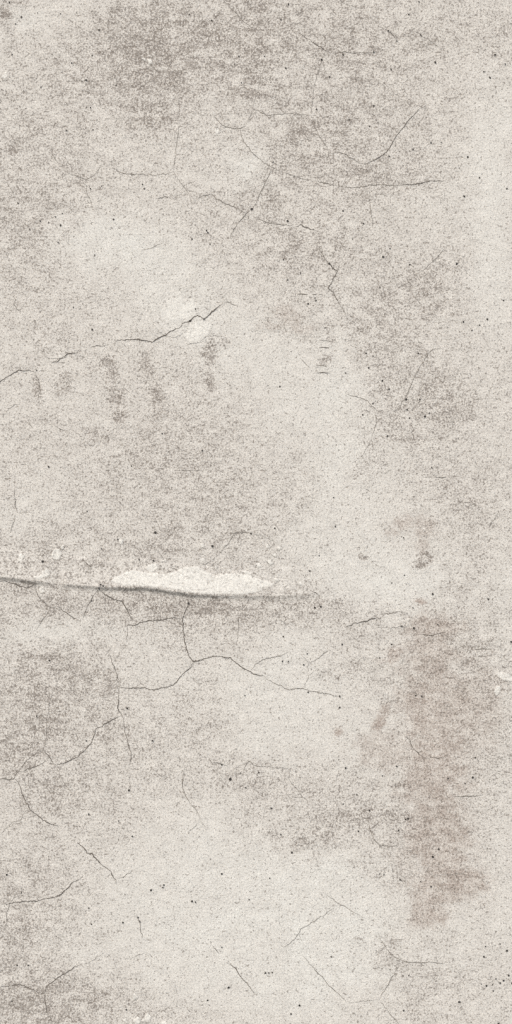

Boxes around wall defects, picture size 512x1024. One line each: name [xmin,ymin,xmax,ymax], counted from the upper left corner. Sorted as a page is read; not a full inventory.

crack [75,34,441,317]
crack [0,301,237,431]
peeling [109,543,282,596]
crack [0,563,333,829]
crack [78,843,132,879]
crack [2,880,78,925]
crack [1,952,105,1015]